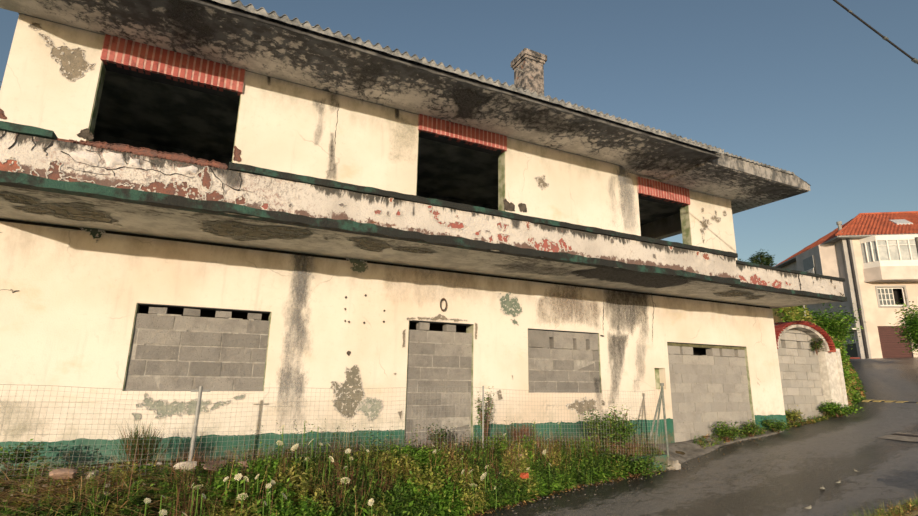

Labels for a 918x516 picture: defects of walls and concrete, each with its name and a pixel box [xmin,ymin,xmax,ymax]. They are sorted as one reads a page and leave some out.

flaking render [28,22,95,82]
damp [454,89,488,119]
damp [515,106,584,134]
peeling [110,166,247,205]
damp [217,168,242,186]
damp [610,151,713,214]
peeling [503,198,573,252]
damp [280,255,310,404]
peeling [498,292,523,326]
damp [501,264,692,389]
peeling [131,393,245,421]
peeling [330,351,384,422]